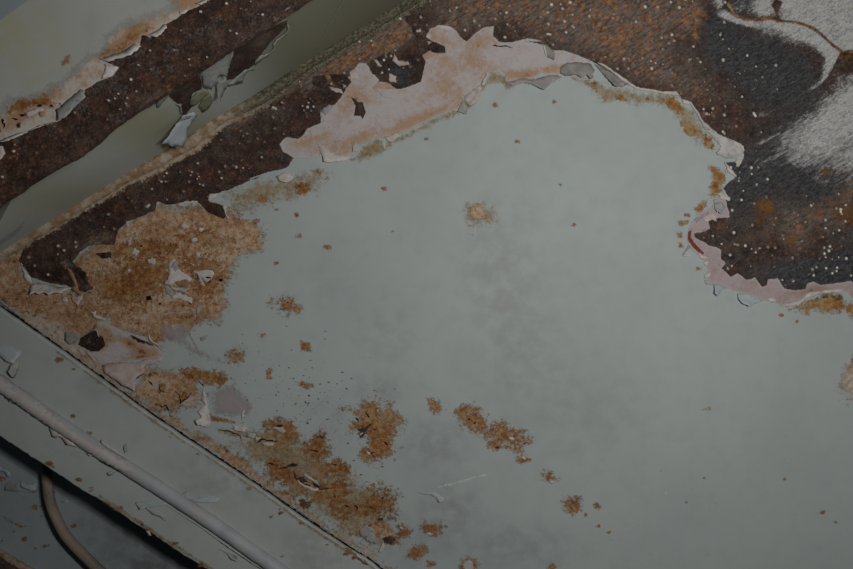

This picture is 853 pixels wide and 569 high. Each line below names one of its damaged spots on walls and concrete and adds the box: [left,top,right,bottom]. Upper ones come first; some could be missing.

peeling [0,0,209,160]
peeling [280,25,745,177]
rust [0,0,853,374]
peeling [682,194,853,307]
peeling [0,374,133,476]
rust [105,366,404,561]
rust [454,404,531,463]
rust [564,495,587,516]